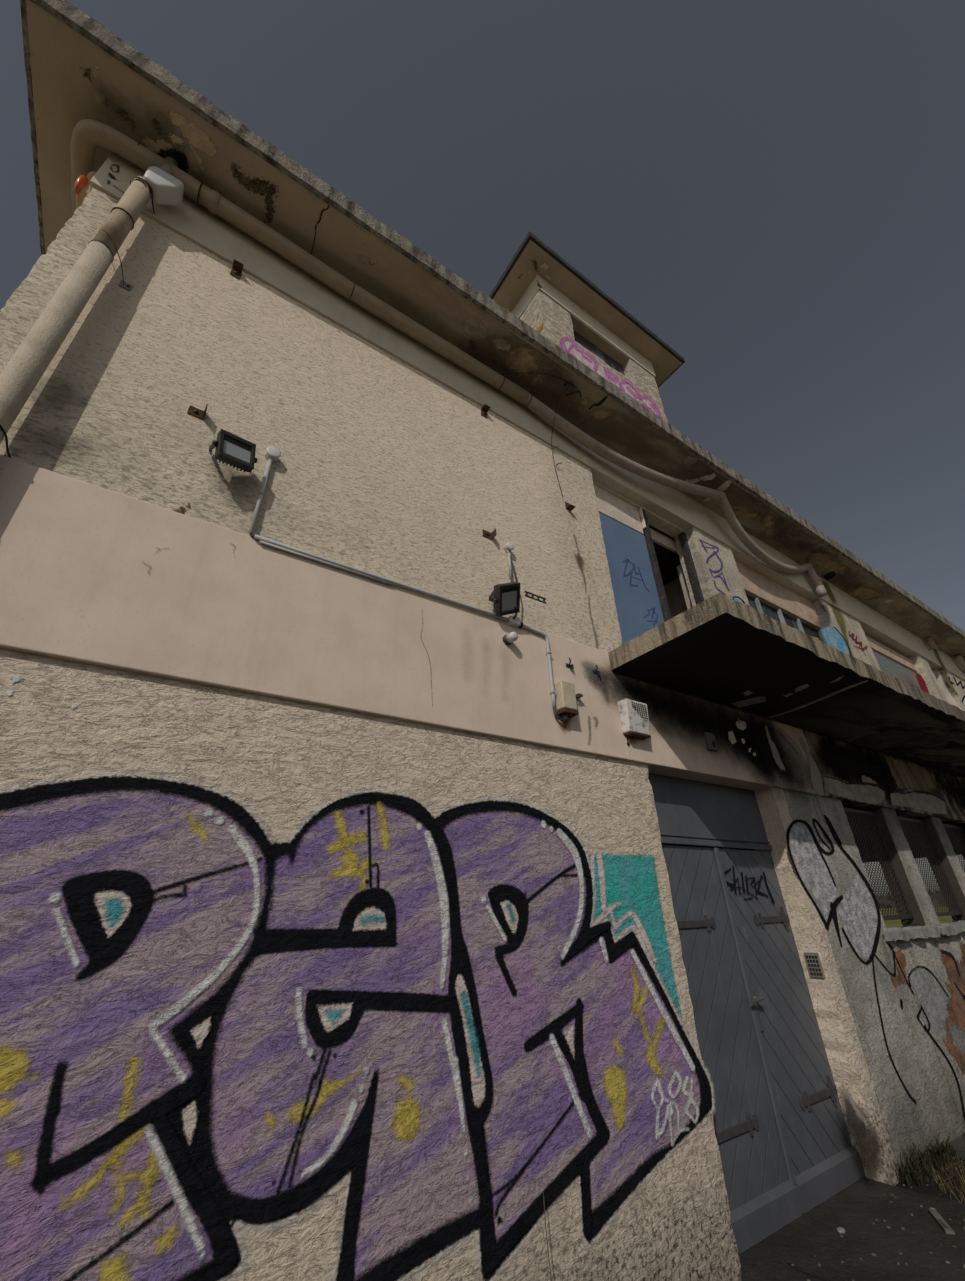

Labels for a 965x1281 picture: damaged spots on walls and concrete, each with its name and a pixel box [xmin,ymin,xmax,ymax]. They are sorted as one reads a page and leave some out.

peeling [104,98,217,171]
spalling [231,162,279,224]
crack [311,205,329,255]
leakage [586,666,892,803]